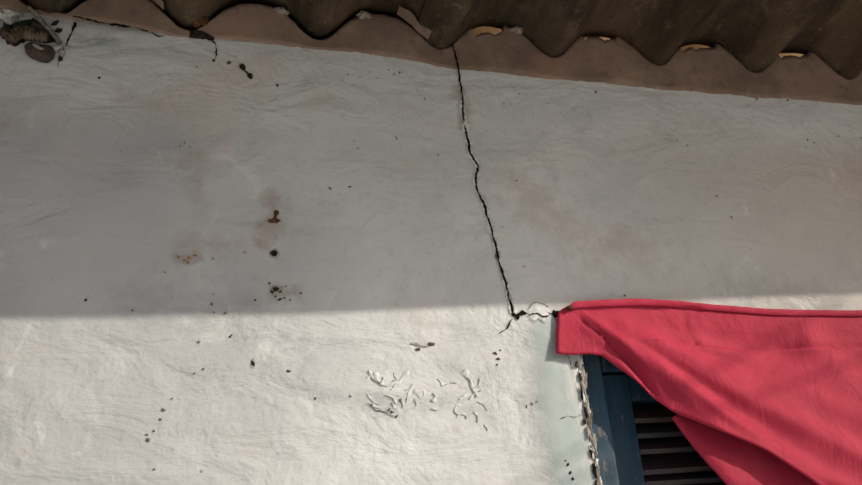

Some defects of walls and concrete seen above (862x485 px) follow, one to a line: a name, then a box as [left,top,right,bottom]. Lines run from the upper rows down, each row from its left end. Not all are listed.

spalling [0,8,70,62]
crack [451,44,527,334]
spalling [560,354,603,485]